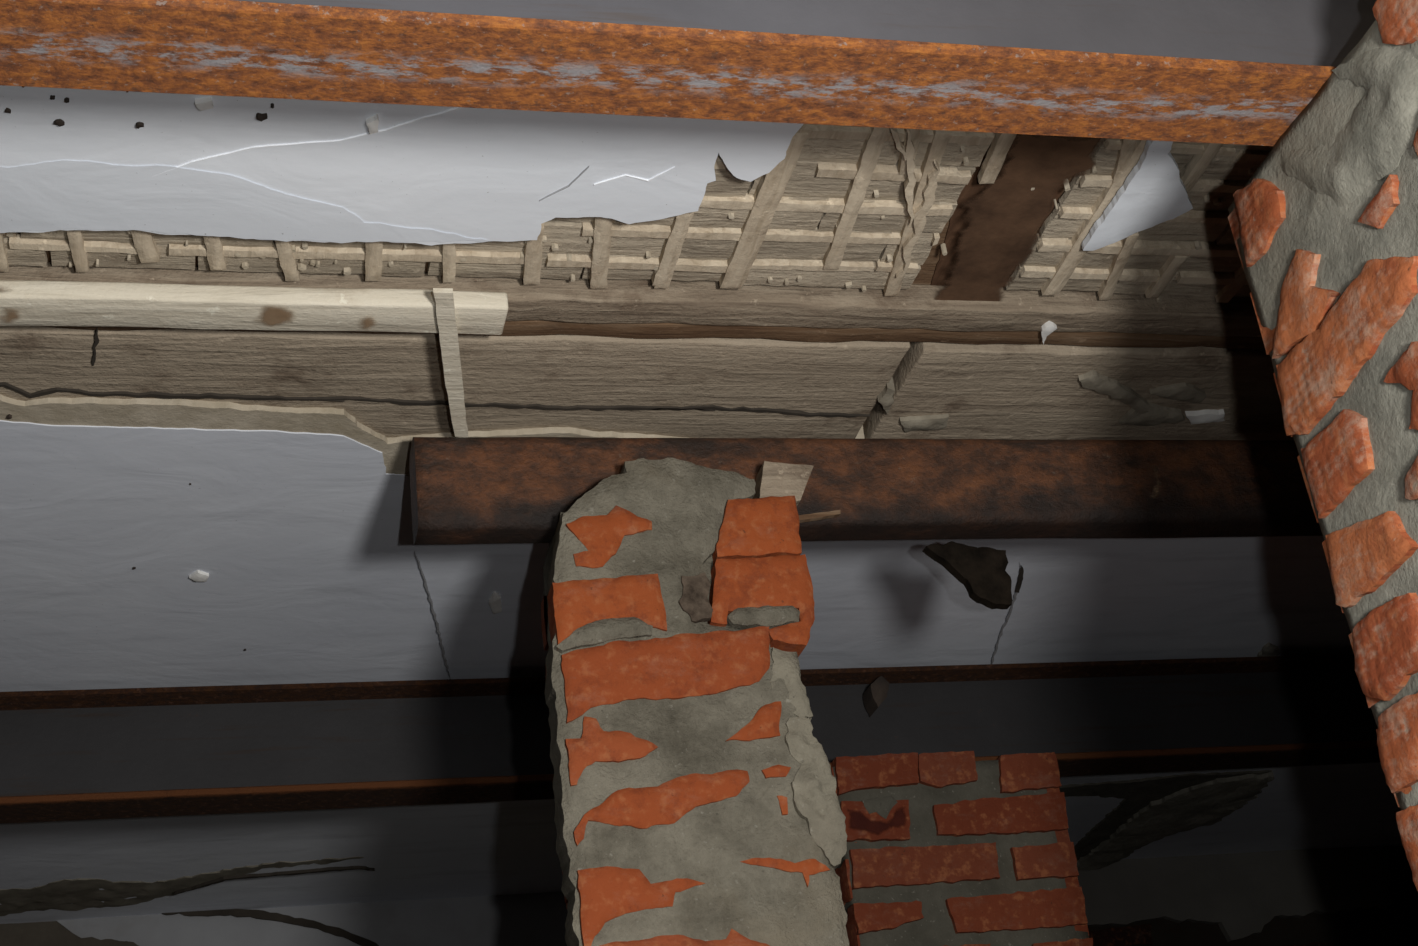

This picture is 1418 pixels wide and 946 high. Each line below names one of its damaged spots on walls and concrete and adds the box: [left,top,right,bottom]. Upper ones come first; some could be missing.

crack [153,107,464,177]
peeling [0,160,488,243]
crack [540,166,675,201]
flaking render [1081,140,1193,251]
spalling [0,856,375,916]